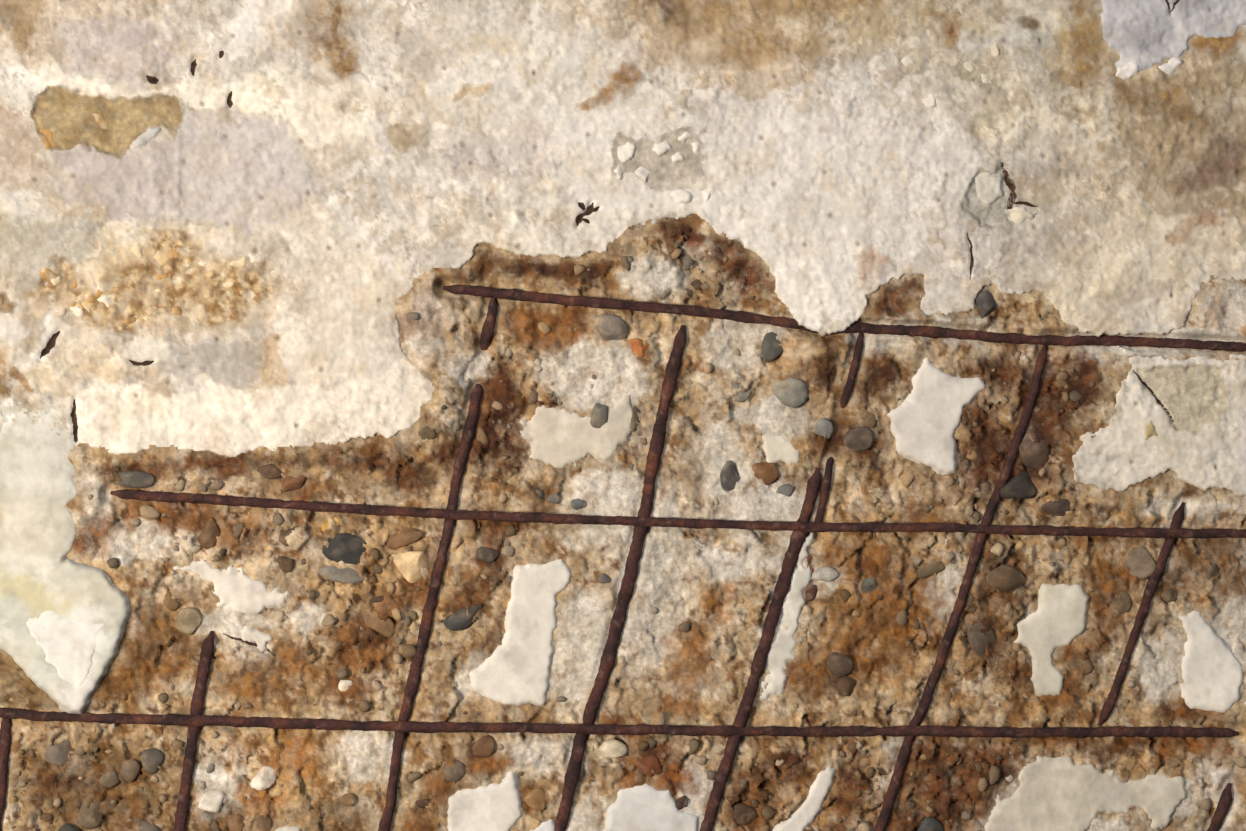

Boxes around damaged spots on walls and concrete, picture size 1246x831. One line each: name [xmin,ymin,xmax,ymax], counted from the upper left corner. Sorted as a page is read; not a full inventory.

peeling [1100,0,1246,80]
peeling [31,86,182,157]
corrosion [101,451,258,482]
corrosion [320,366,528,492]
corrosion [814,416,883,468]
corrosion [860,353,898,395]
corrosion [975,359,1098,454]
spalling [0,214,1246,831]
corrosion [321,579,429,706]
corrosion [1164,701,1197,720]
corrosion [731,752,810,827]
corrosion [888,745,1017,831]